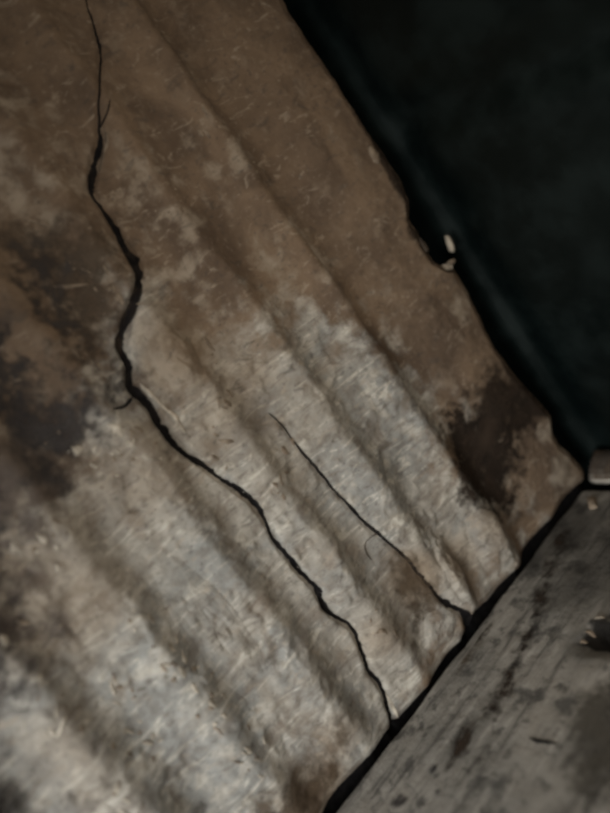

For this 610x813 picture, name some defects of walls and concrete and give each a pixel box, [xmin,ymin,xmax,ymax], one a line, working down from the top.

crack [85,0,398,724]
crack [269,413,473,626]